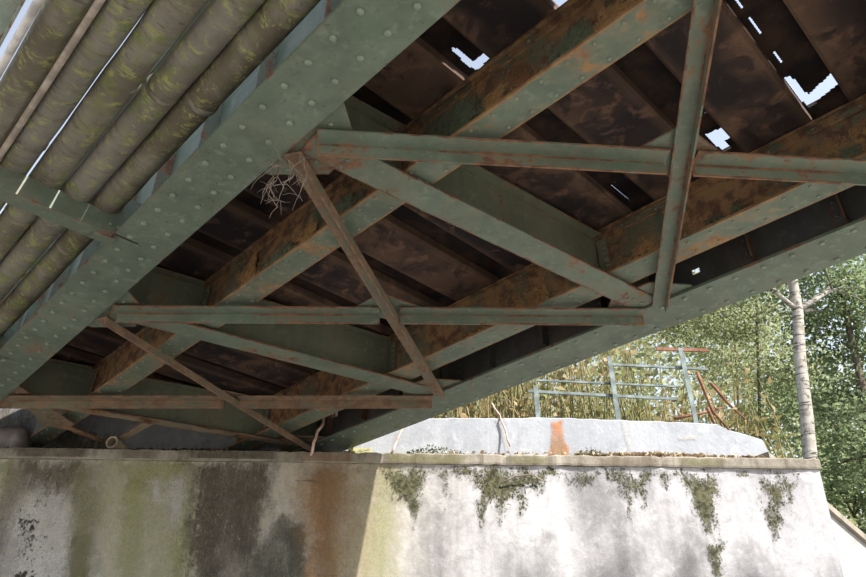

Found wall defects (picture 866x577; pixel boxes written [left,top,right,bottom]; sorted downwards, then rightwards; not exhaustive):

damp [0,409,32,433]
rust [549,421,569,456]
damp [0,428,108,577]
damp [185,446,309,577]
rust [301,455,370,577]